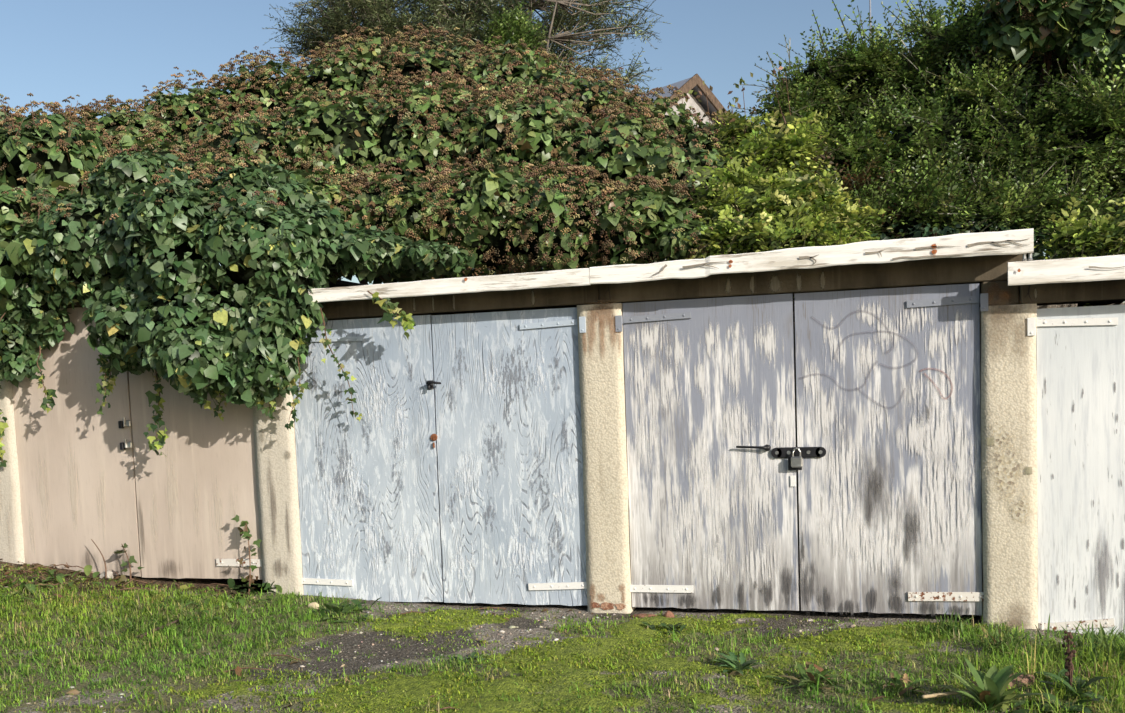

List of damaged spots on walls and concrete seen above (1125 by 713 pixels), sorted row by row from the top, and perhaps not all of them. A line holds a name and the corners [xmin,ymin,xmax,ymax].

damp [865,456,888,525]
damp [738,498,922,615]
damp [645,593,694,608]